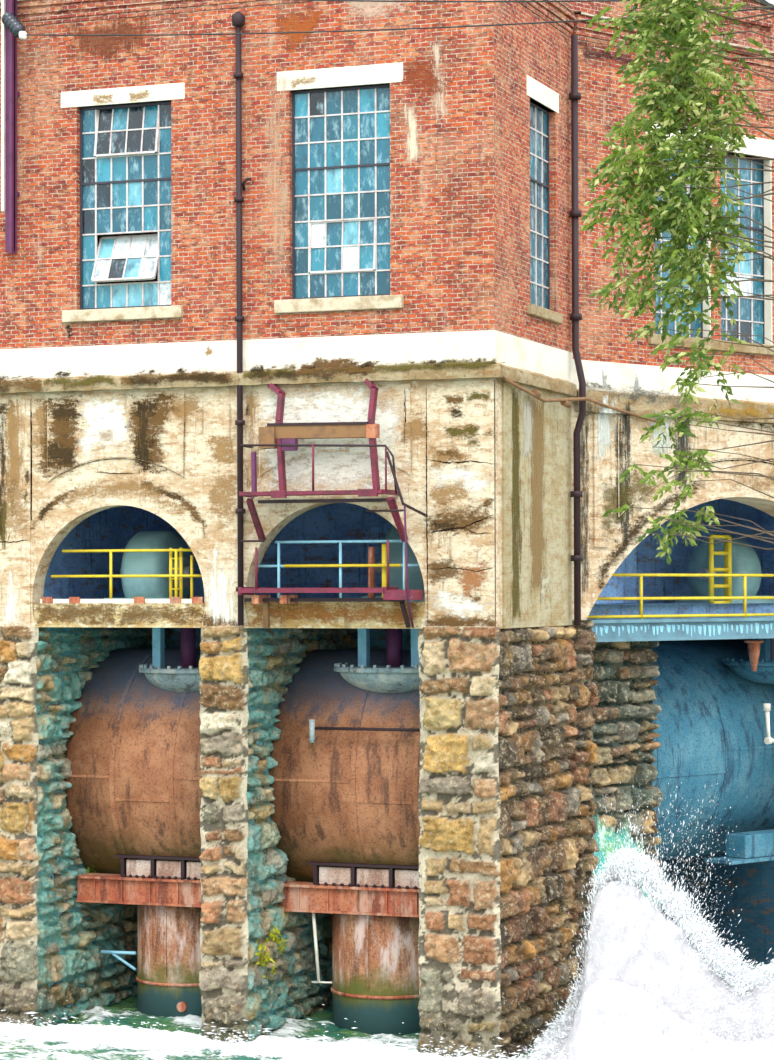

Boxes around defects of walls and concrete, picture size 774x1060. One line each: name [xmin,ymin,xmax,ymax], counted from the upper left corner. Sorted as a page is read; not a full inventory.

water stain [0,366,409,549]
crack [404,390,491,608]
water stain [580,396,704,592]